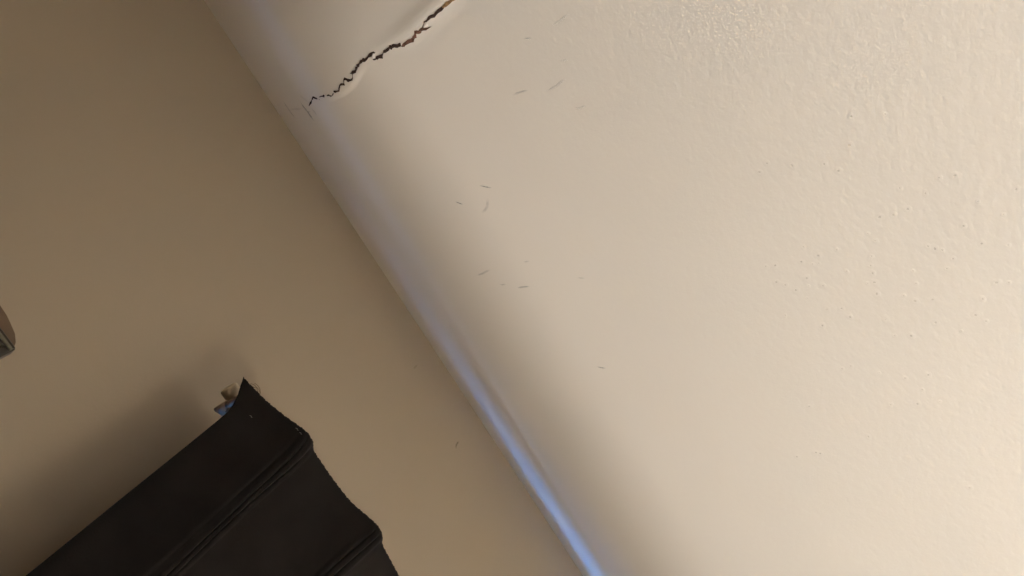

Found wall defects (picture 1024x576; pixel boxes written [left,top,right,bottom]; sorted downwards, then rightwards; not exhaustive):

crack [309,0,454,106]